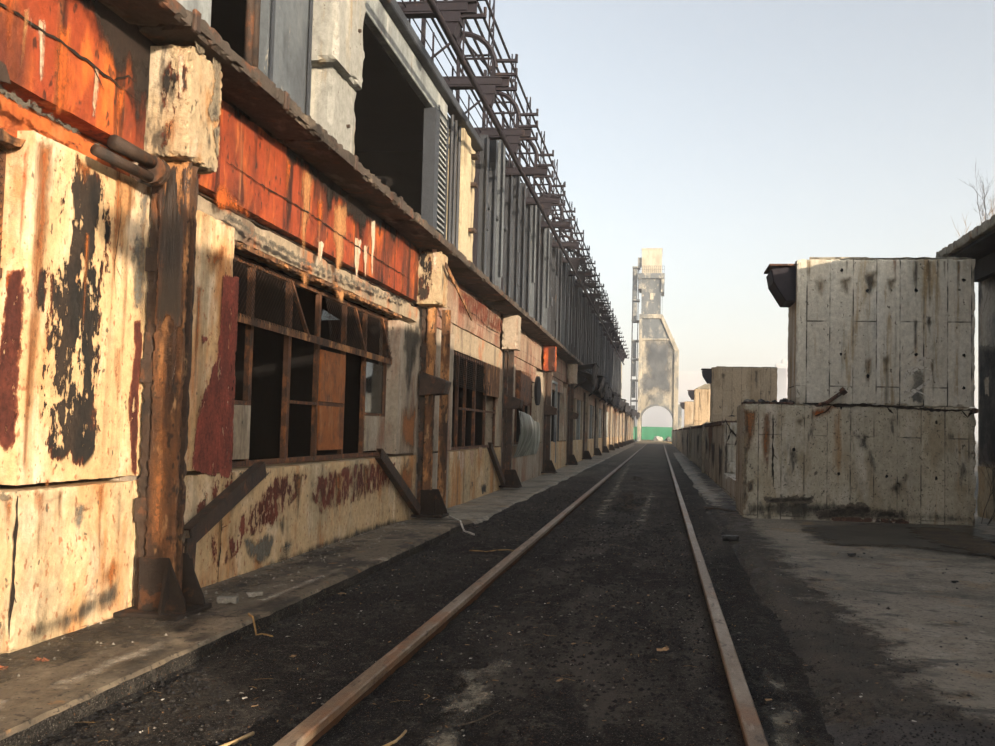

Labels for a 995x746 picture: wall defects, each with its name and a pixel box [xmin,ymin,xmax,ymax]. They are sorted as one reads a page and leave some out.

corrosion [57,30,69,109]
corrosion [216,189,248,214]
corrosion [212,250,223,268]
peeling [0,151,111,466]
corrosion [746,412,770,466]
corrosion [152,457,164,540]
peeling [212,463,395,567]